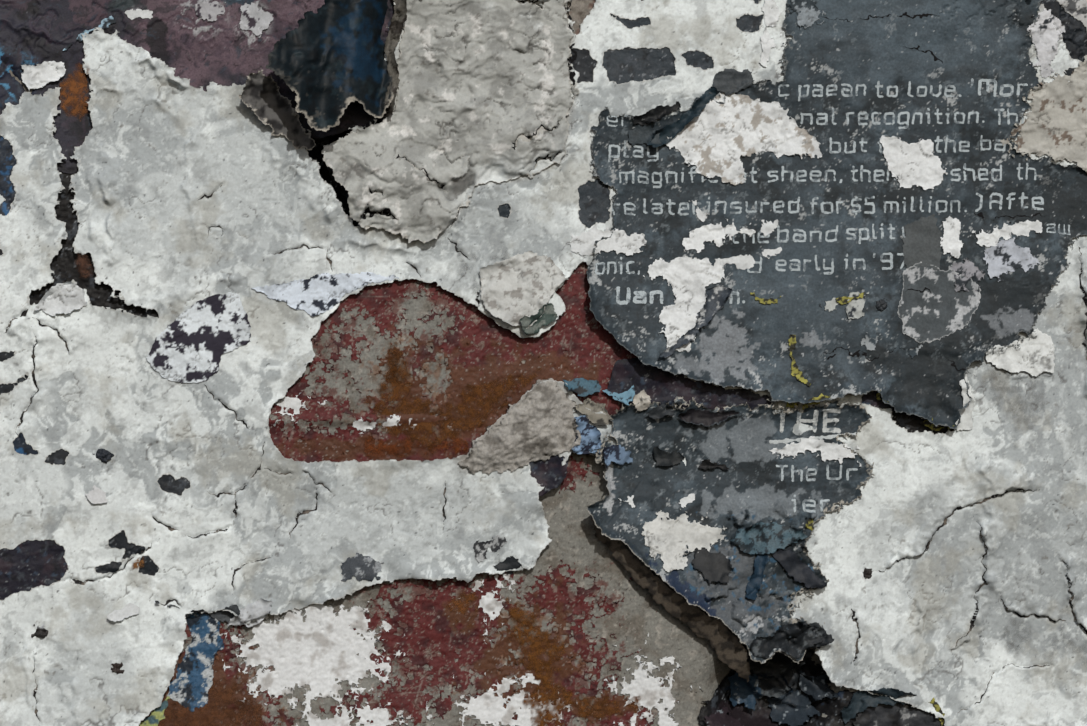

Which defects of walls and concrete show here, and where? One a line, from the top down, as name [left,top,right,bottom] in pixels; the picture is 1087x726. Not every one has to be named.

peeling [569,47,714,84]
peeling [0,0,394,383]
crack [308,151,398,226]
rust [364,342,536,457]
peeling [861,374,975,435]
crack [55,385,331,595]
peeling [141,250,945,726]
peeling [0,540,68,600]
crack [879,489,1087,648]
rust [158,682,263,726]
rust [506,598,639,726]
crack [851,609,861,665]